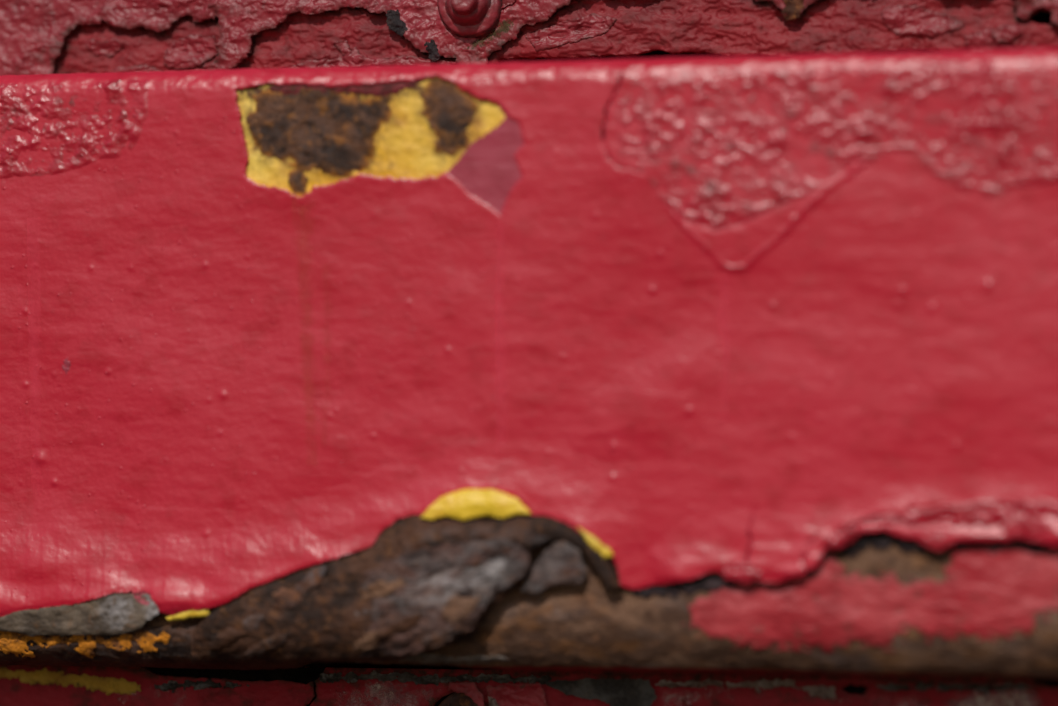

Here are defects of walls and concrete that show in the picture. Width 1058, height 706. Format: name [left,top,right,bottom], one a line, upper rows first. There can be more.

spalling [55,15,221,74]
spalling [488,0,1058,63]
peeling [236,7,524,214]
spalling [825,499,1058,552]
corrosion [0,489,1058,678]
spalling [722,561,763,584]
peeling [447,678,836,706]